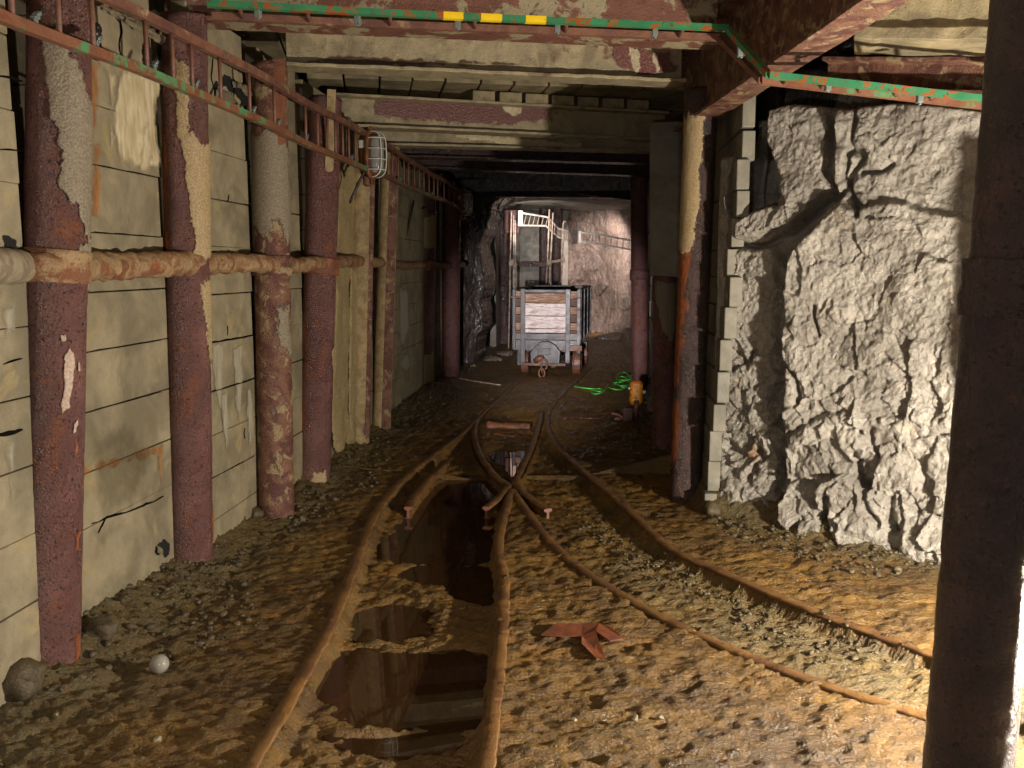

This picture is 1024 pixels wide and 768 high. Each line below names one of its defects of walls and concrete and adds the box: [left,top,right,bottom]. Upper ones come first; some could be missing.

corrosion [674,252,690,387]
peeling [61,334,80,414]
crack [0,429,23,437]
crack [92,496,164,533]